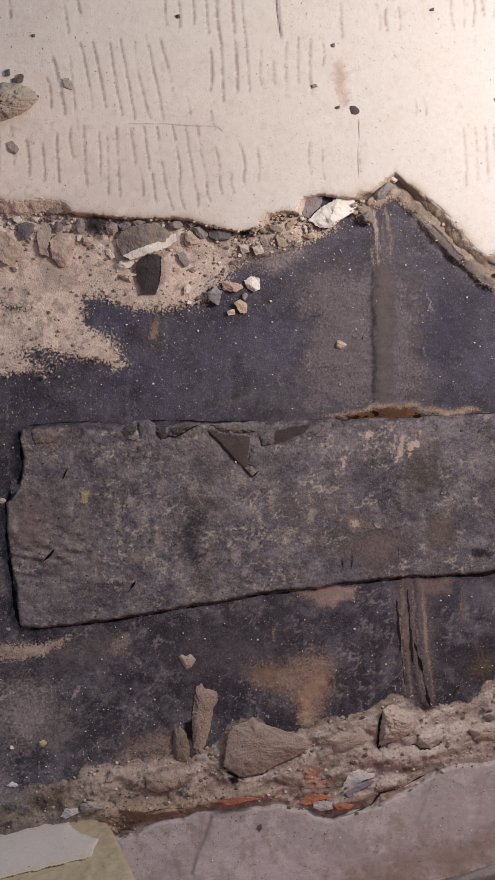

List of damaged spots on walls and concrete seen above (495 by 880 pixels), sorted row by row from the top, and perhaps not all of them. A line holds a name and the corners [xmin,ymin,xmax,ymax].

spalling [0,173,495,382]
peeling [289,229,436,440]
peeling [122,419,189,440]
peeling [211,422,276,446]
peeling [394,430,422,464]
crack [5,420,317,630]
crack [340,542,495,586]
peeling [178,654,196,670]
peeling [0,669,81,754]
spalling [341,768,376,789]
spalling [313,800,333,811]
flaking render [0,822,98,879]